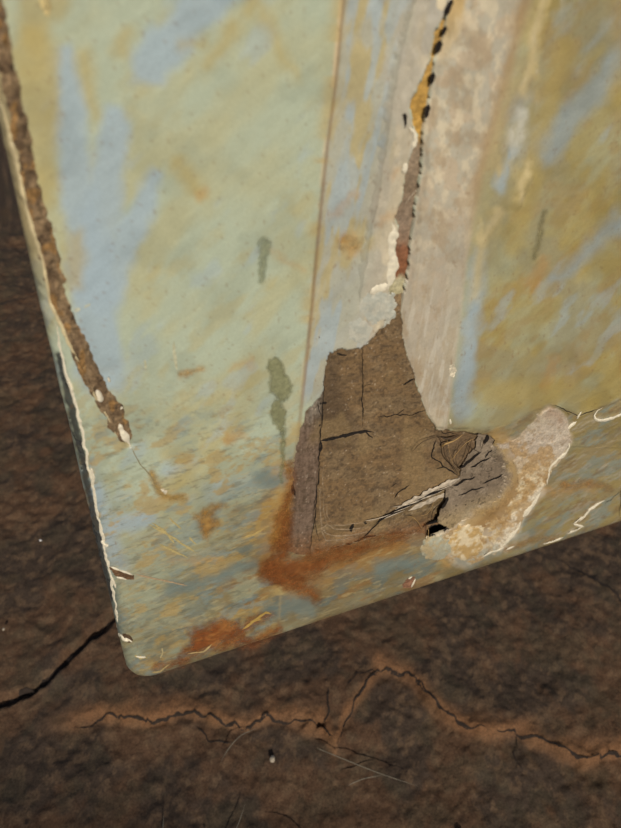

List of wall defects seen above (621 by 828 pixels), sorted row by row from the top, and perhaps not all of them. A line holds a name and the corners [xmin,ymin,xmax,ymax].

crack [370,0,453,295]
corrosion [0,0,182,499]
leakage [259,238,270,282]
leakage [268,357,291,477]
spalling [285,293,581,566]
crack [552,404,599,417]
peeling [593,407,621,422]
corrosion [261,492,400,599]
peeling [544,500,605,544]
corrosion [156,616,280,668]